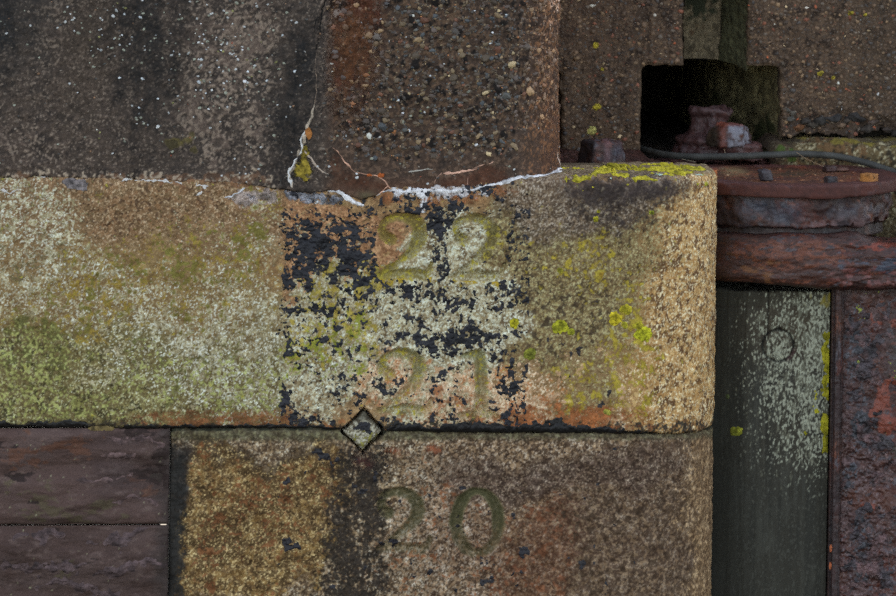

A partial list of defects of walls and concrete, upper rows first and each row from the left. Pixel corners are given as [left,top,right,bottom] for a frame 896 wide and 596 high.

crack [280,0,390,195]
crack [409,161,494,185]